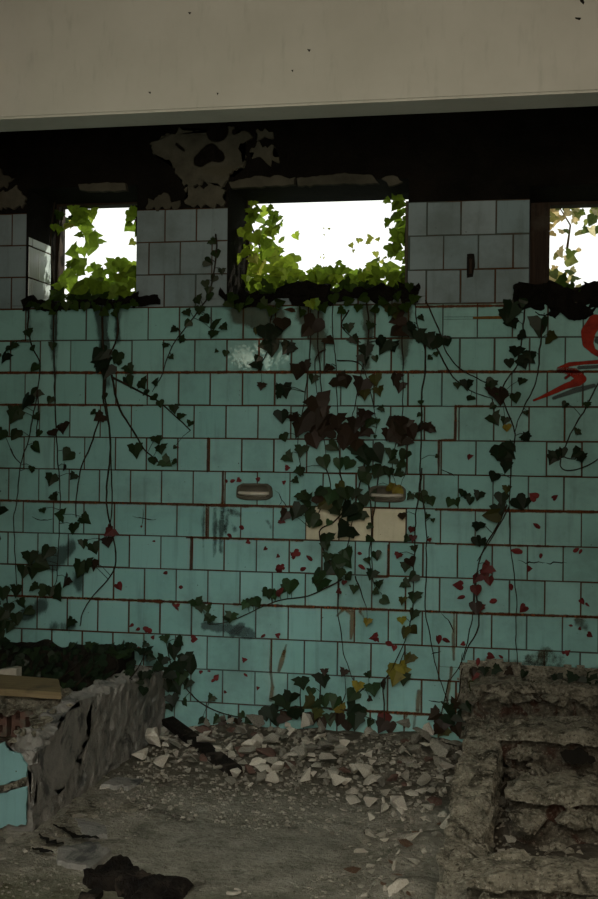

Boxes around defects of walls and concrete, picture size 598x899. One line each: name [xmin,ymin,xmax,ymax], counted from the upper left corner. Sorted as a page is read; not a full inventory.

spalling [146,122,403,211]
spalling [456,658,598,739]
peeling [0,696,97,820]